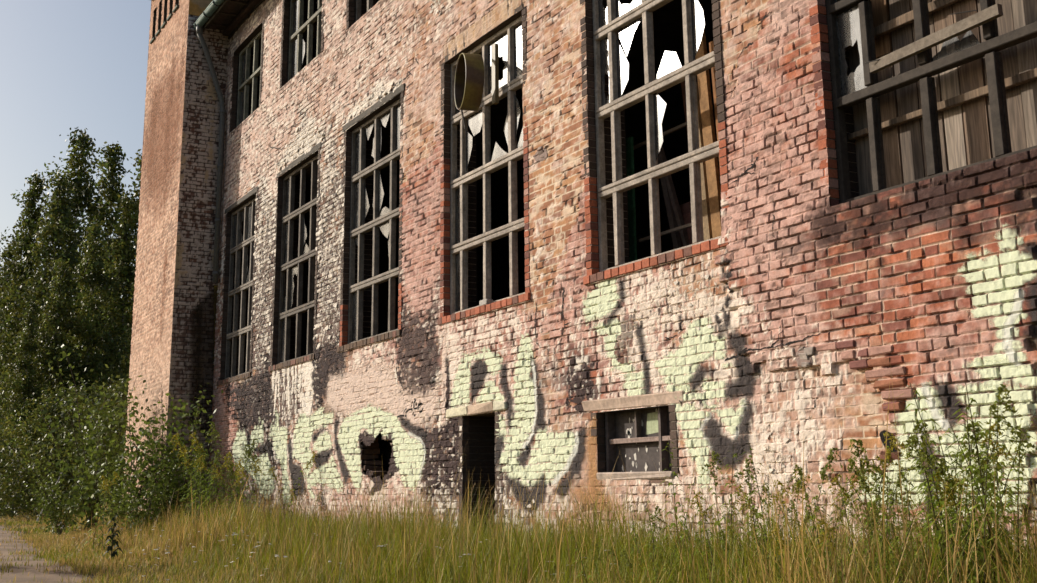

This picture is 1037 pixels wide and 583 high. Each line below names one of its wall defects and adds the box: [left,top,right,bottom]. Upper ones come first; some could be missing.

peeling [326,324,447,495]